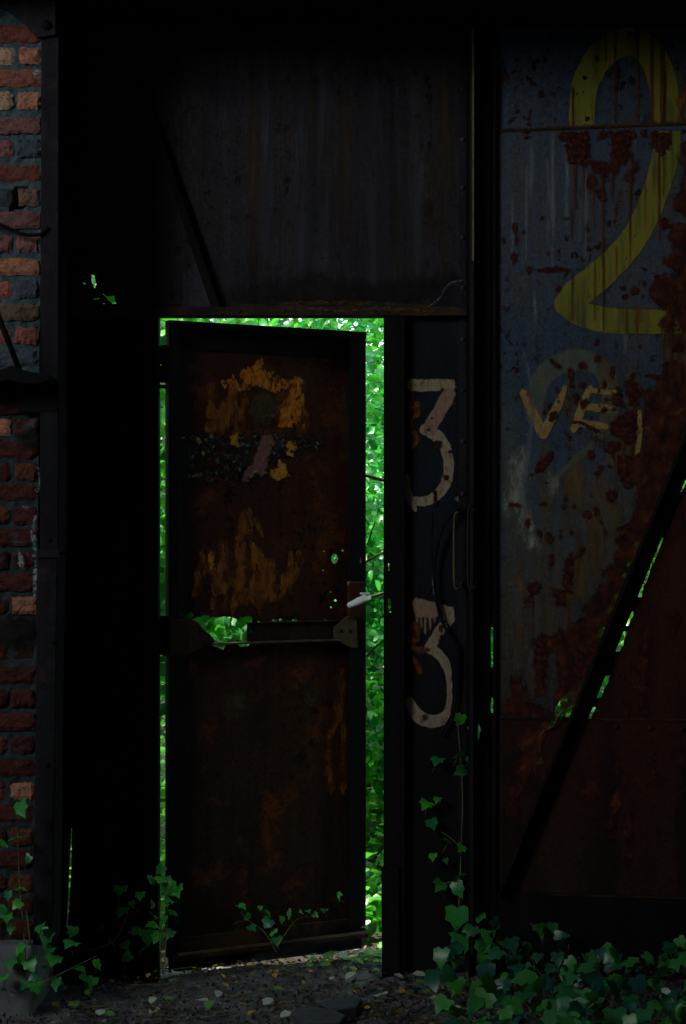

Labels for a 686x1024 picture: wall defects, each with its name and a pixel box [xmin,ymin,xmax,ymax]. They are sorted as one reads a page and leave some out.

peeling [179,428,325,487]
corrosion [508,26,686,718]